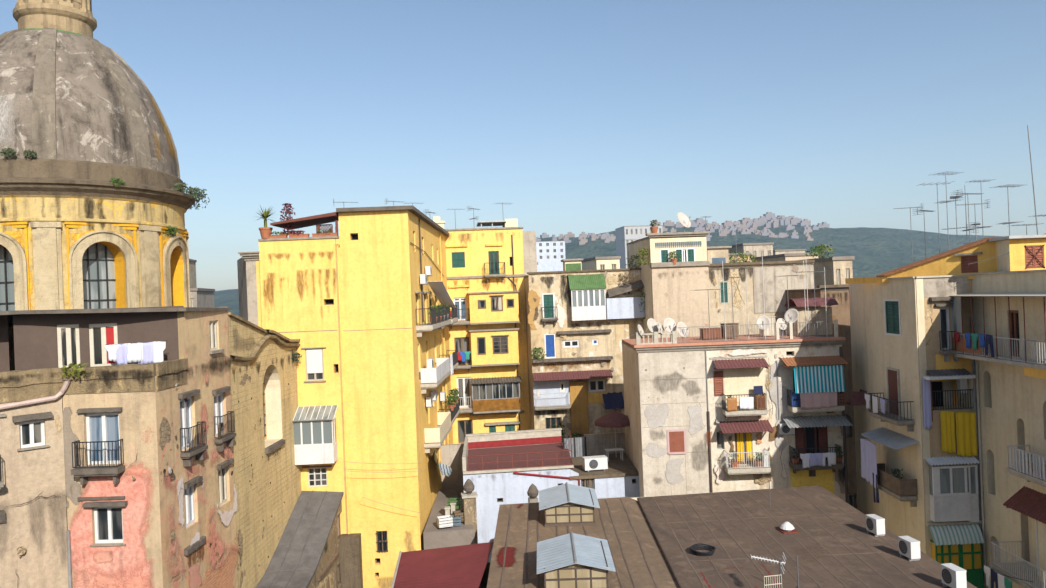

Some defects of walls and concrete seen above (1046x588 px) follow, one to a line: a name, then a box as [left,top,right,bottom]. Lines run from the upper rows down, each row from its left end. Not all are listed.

flaking render [188,483,246,588]